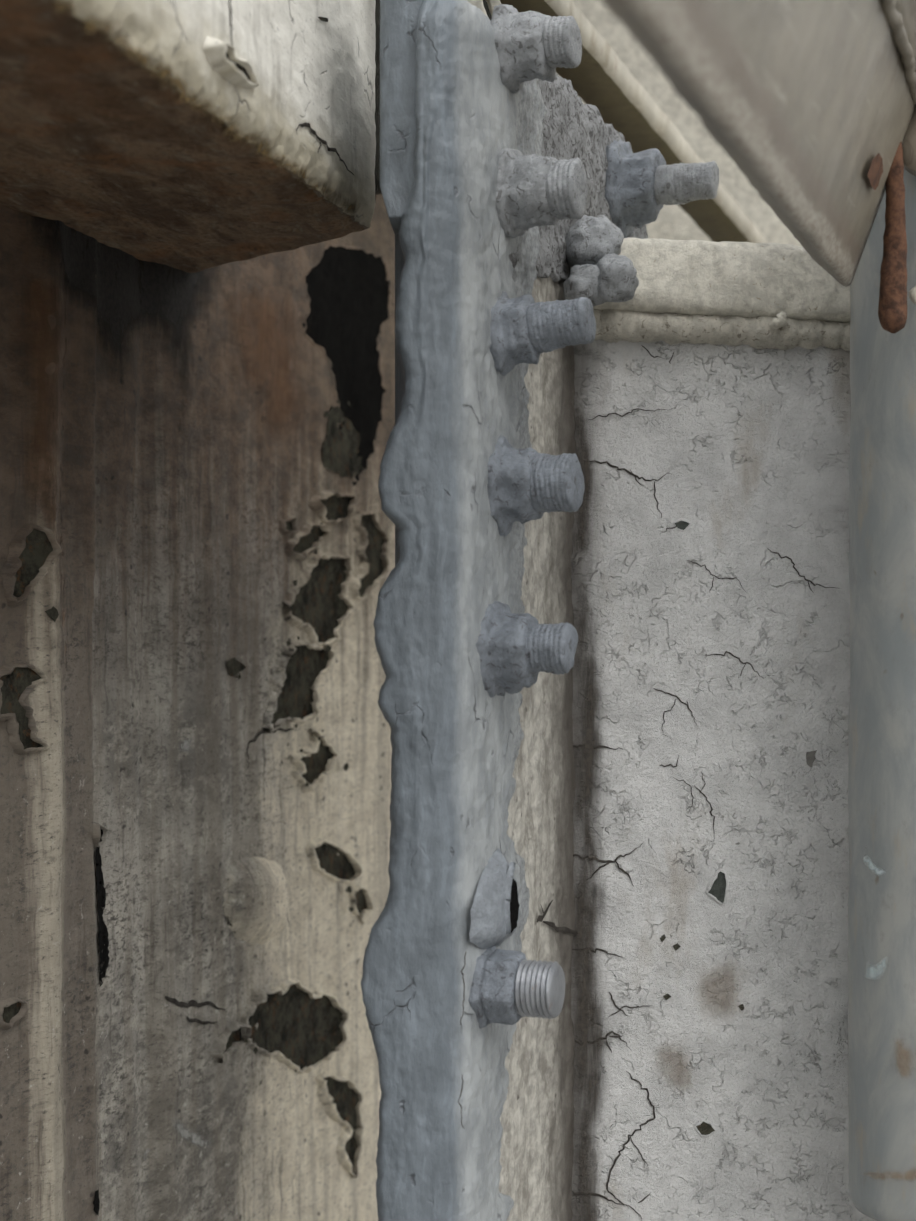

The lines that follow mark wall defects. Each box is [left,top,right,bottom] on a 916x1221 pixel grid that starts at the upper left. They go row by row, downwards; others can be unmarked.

crack [296,0,380,203]
peeling [1,524,62,606]
peeling [261,243,391,793]
crack [589,460,684,533]
peeling [0,663,51,755]
crack [653,688,715,833]
crack [95,846,110,986]
peeling [305,837,374,925]
crack [537,900,627,959]
crack [573,842,644,885]
peeling [207,979,365,1178]
crack [571,992,656,1221]